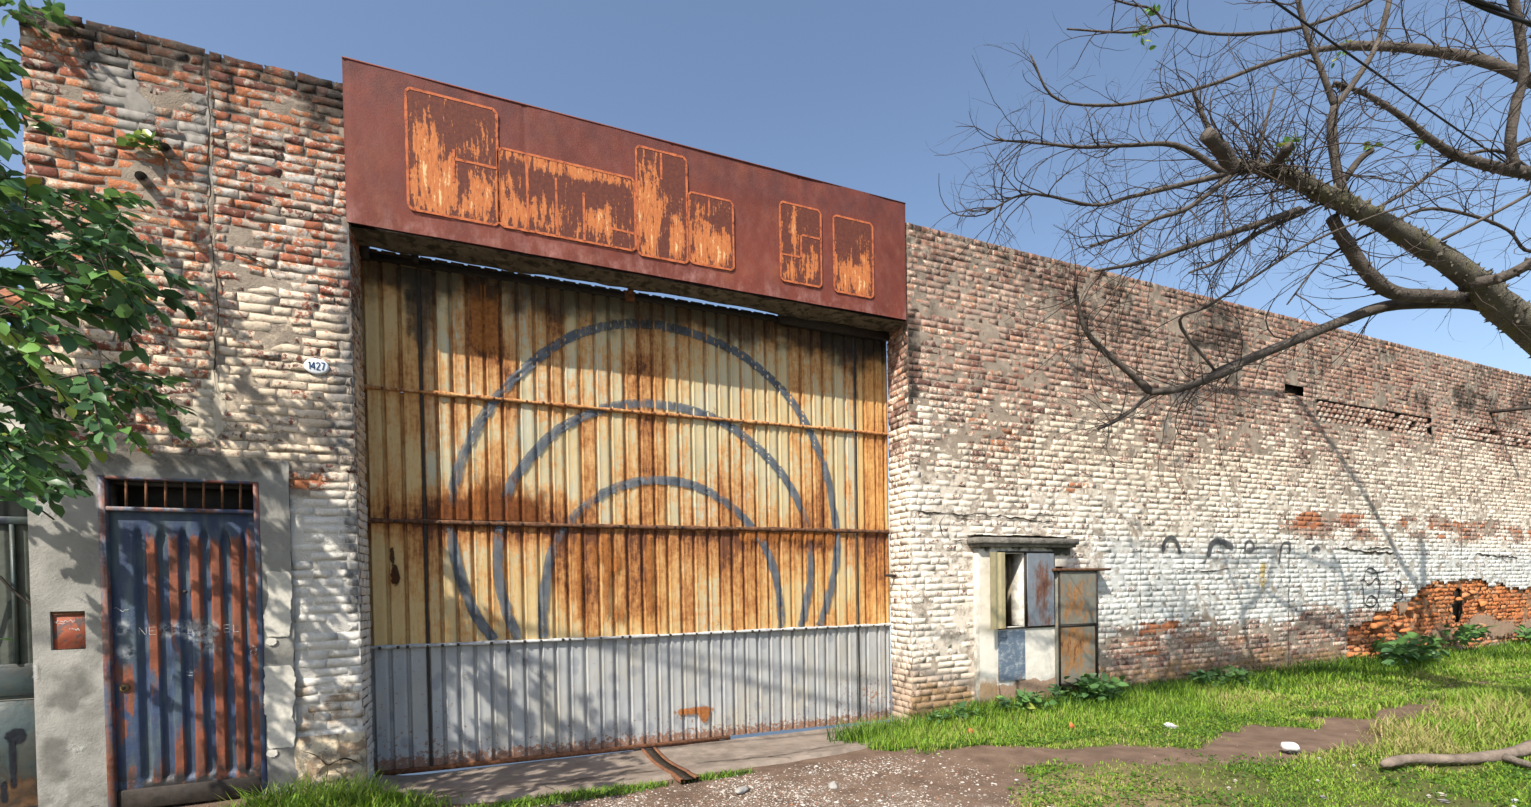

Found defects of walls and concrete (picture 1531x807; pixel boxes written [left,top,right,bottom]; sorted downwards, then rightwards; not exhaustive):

peeling [158,115,206,150]
crack [175,61,286,390]
rust [470,284,499,361]
rust [430,476,543,521]
rust [739,531,835,551]
rust [390,547,400,586]
rust [576,533,625,628]
spalling [1346,579,1531,661]
rust [675,706,714,723]